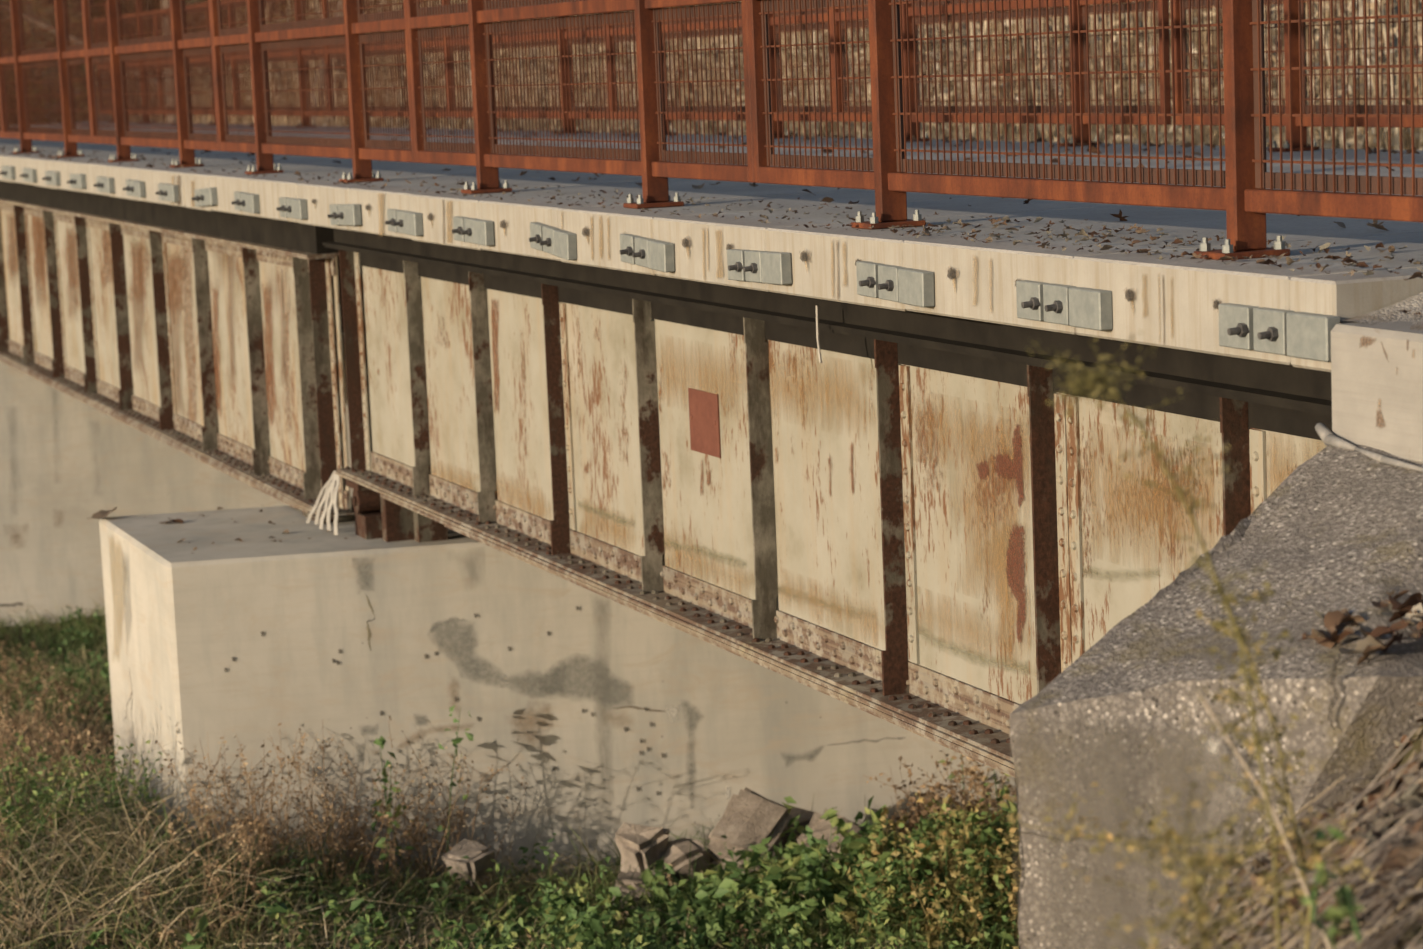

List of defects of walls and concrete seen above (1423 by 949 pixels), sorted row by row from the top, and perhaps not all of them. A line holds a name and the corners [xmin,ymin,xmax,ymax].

corrosion [7,213,47,298]
corrosion [64,228,79,310]
corrosion [966,429,1026,630]
corrosion [1080,439,1212,573]